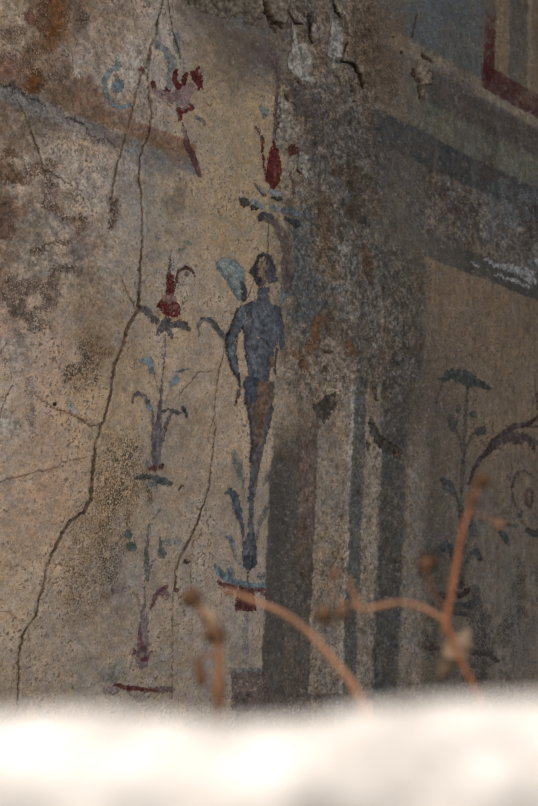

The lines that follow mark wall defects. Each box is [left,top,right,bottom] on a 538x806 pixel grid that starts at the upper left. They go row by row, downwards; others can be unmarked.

spalling [288,1,347,89]
peeling [410,54,433,99]
spalling [275,94,301,148]
spalling [297,151,313,180]
spalling [470,257,538,288]
crack [16,0,181,711]
crack [171,421,216,627]